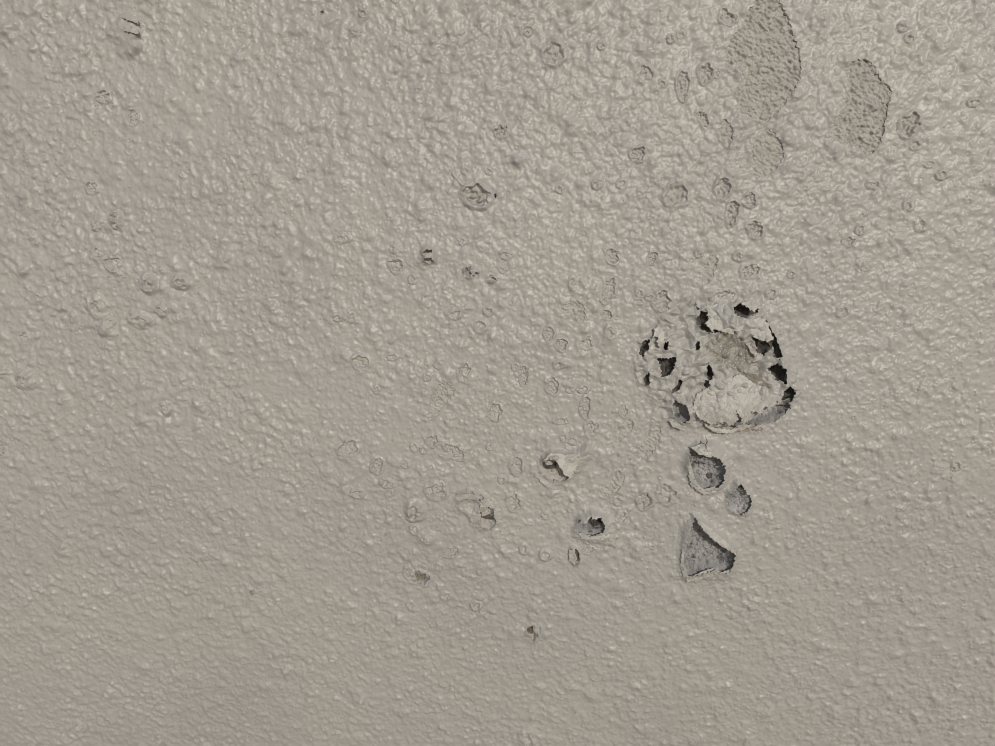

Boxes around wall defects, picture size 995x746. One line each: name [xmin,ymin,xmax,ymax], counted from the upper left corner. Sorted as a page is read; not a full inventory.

peeling [637,0,803,125]
peeling [694,110,735,149]
peeling [825,58,951,182]
spalling [660,178,691,210]
spalling [712,174,767,241]